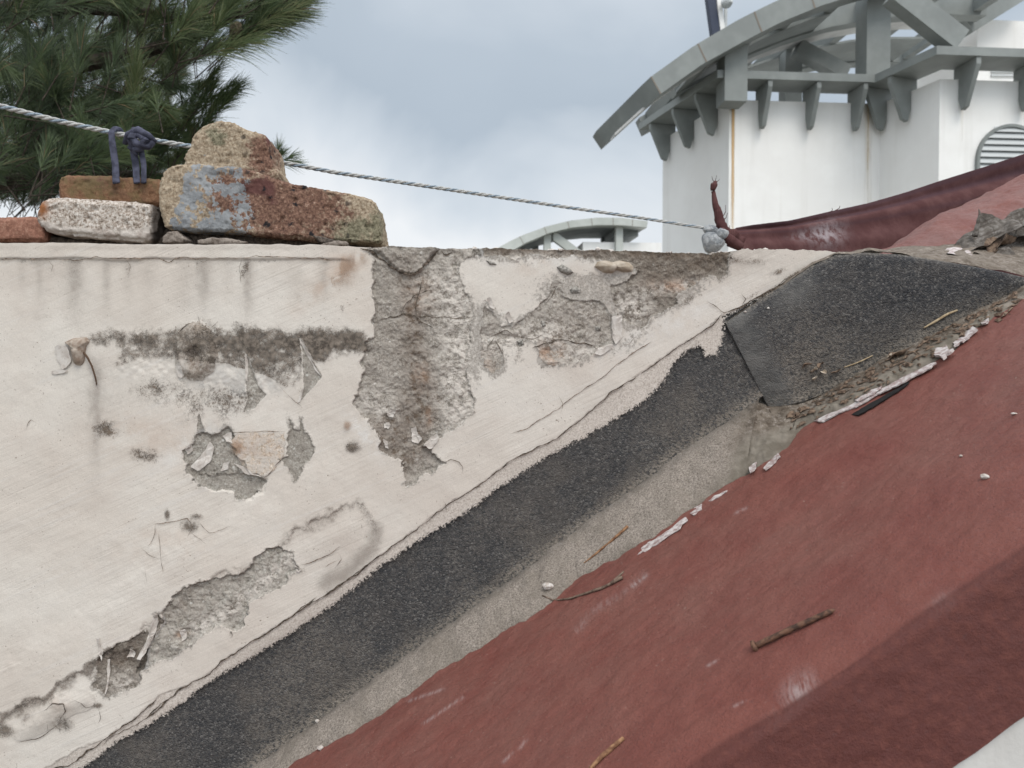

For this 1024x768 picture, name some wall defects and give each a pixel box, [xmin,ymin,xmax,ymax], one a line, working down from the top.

water stain [90,322,368,386]
crack [360,248,463,329]
spalling [352,246,730,487]
spalling [182,414,315,500]
crack [21,276,792,768]
spalling [91,547,301,698]